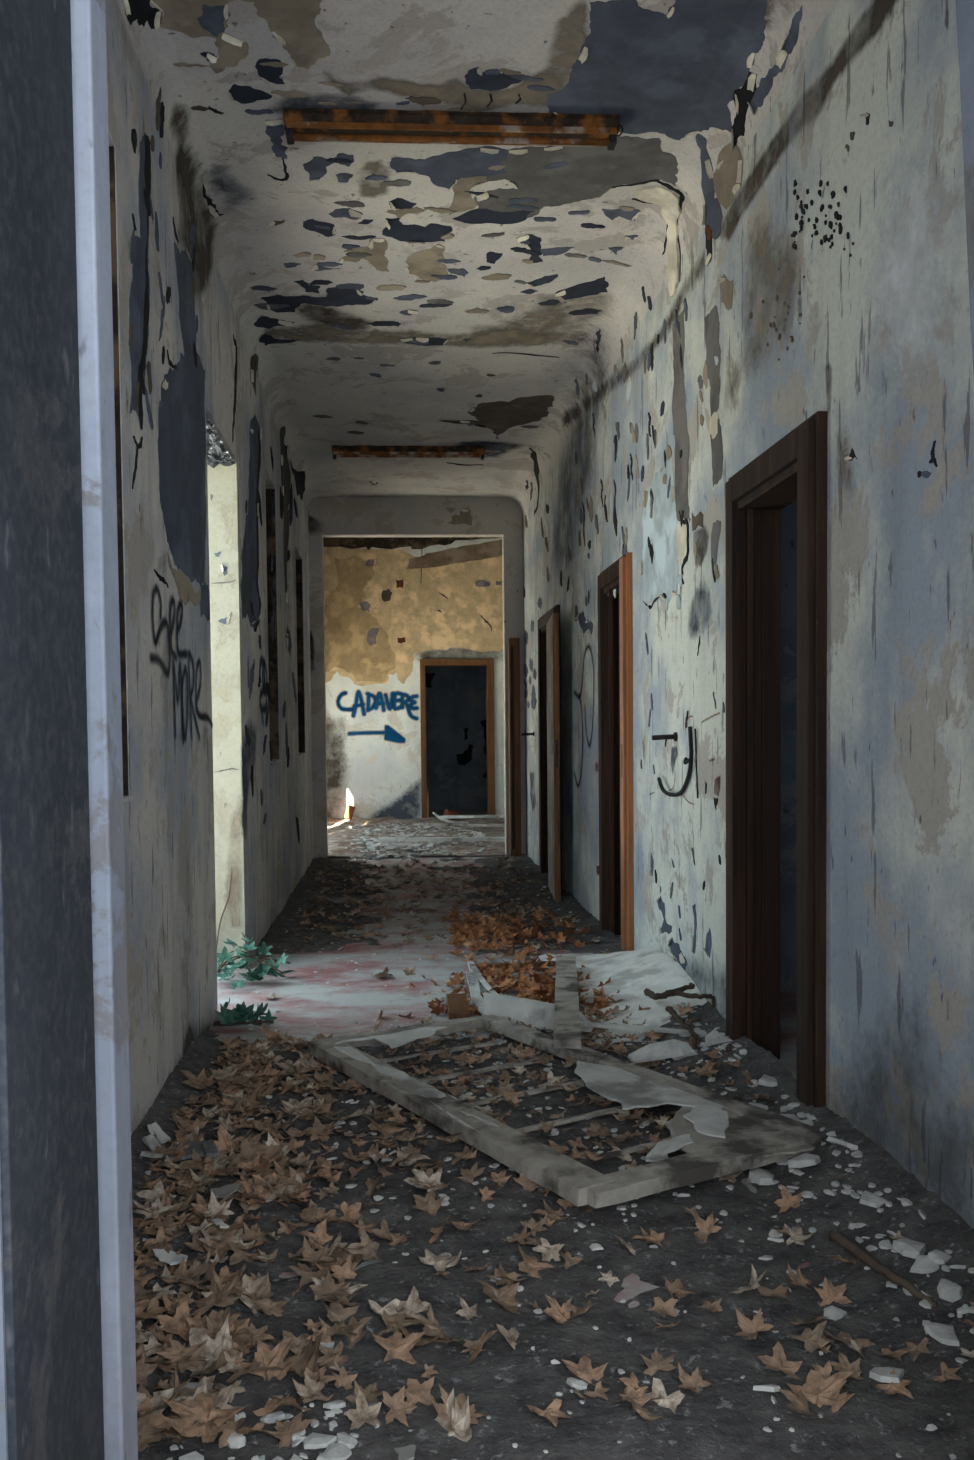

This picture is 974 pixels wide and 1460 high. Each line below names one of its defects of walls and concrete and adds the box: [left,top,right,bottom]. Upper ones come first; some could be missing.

peeling [323,538,503,688]
peeling [123,0,803,635]